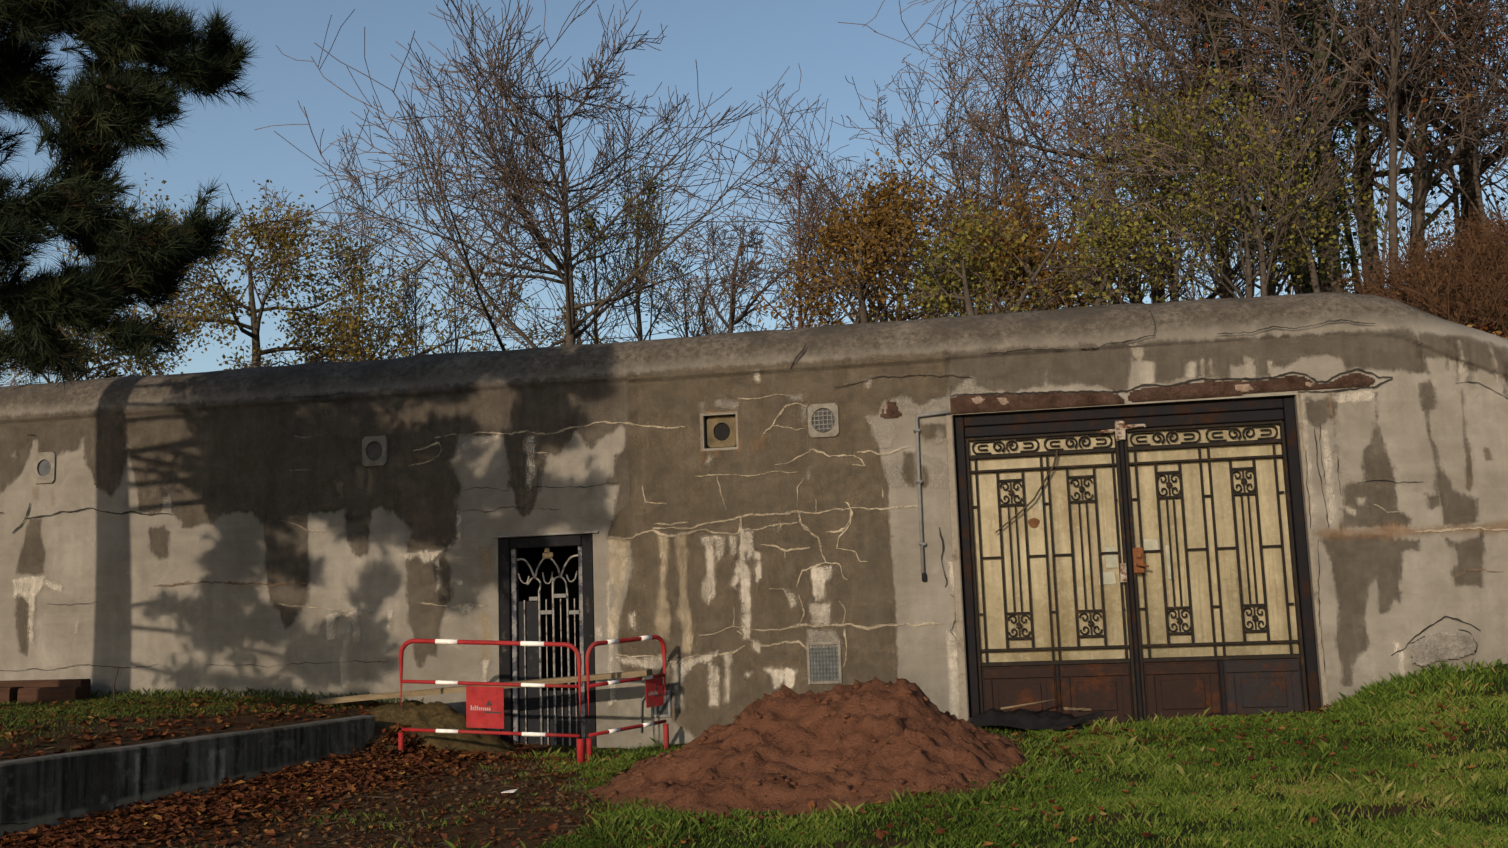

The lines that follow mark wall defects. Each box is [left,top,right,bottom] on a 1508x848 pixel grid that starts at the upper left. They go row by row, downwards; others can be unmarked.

water stain [0,329,1508,737]
crack [408,310,1508,672]